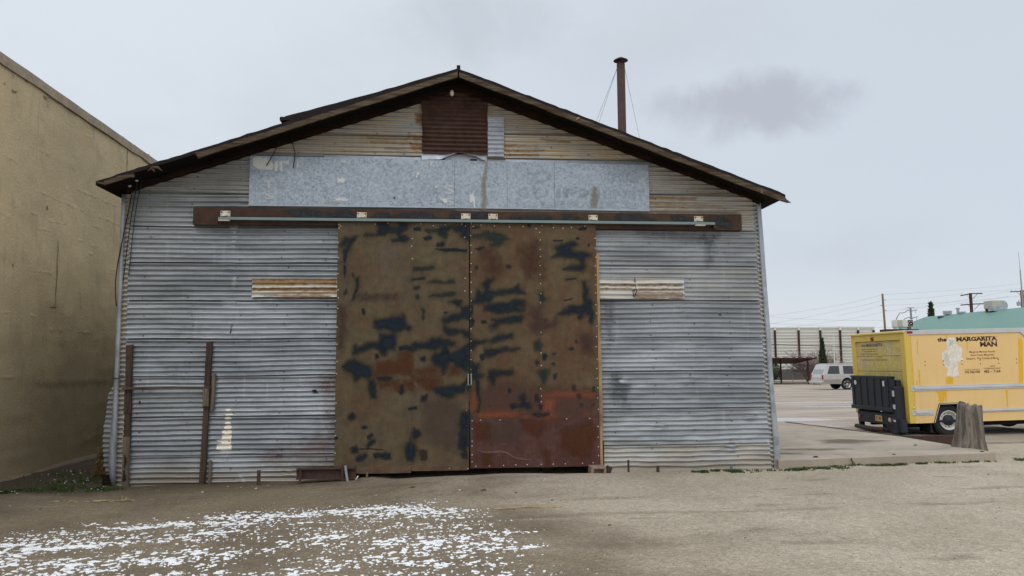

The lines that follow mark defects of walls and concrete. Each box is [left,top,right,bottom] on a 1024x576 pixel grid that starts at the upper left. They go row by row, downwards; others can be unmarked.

rust [253,280,336,297]
rust [600,284,683,298]